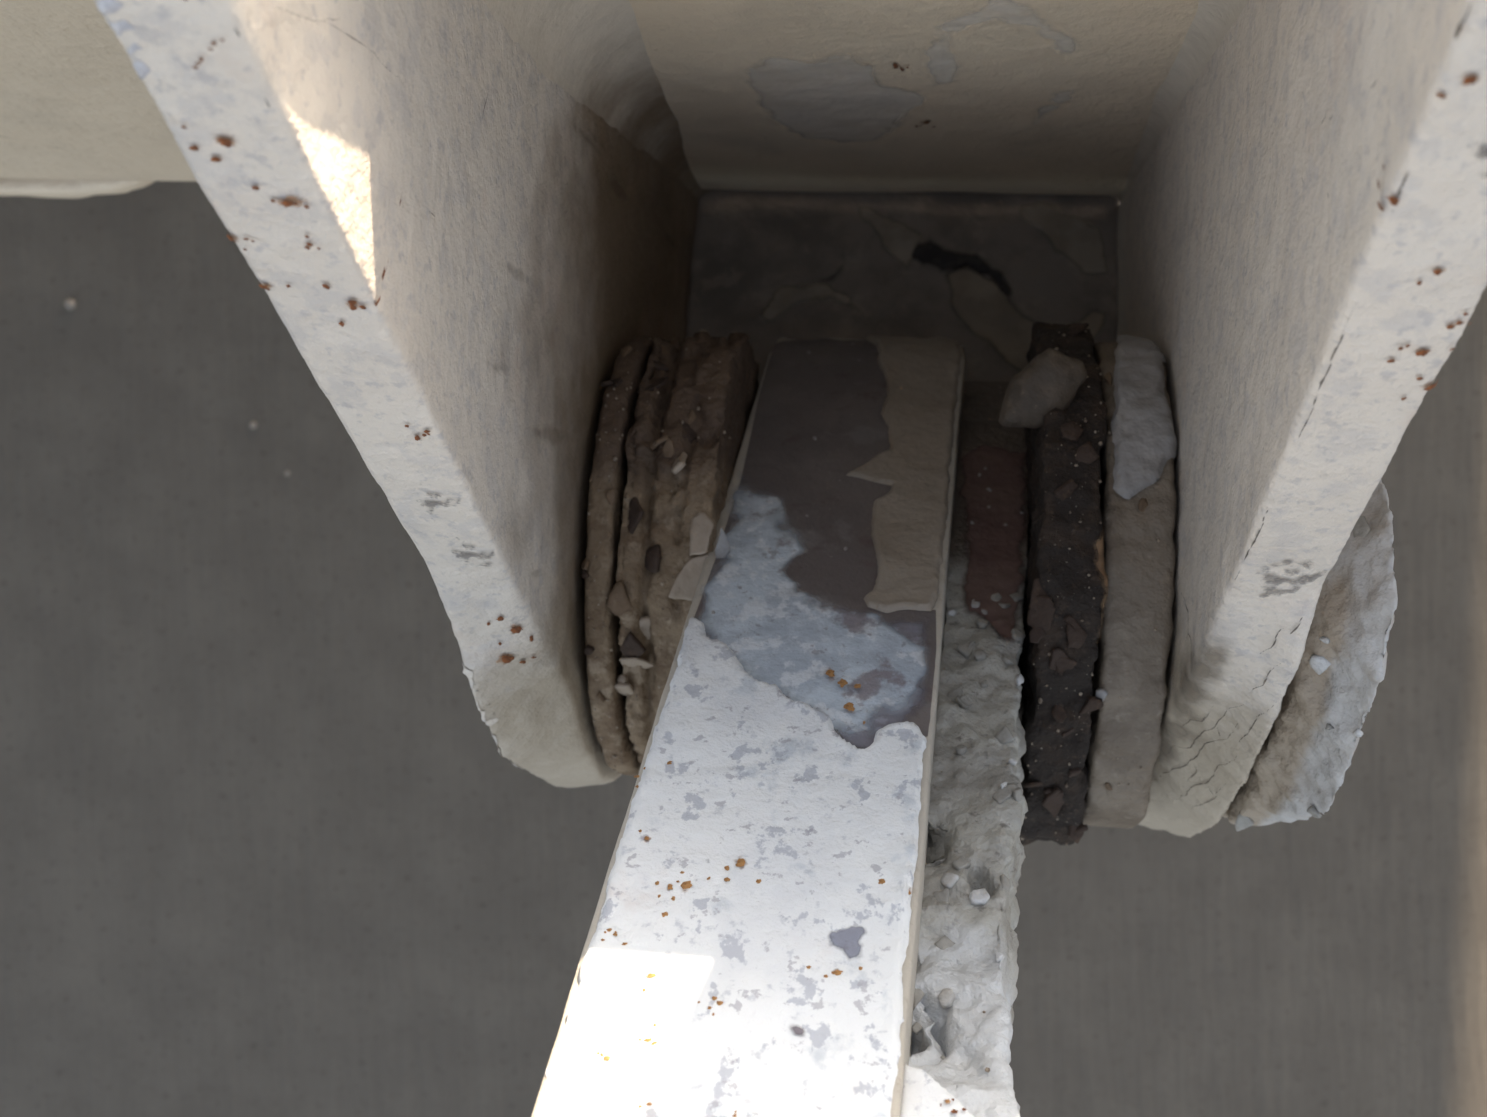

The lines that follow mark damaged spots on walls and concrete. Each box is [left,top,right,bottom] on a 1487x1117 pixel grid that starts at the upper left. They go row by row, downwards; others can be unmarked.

rust [189,137,233,162]
rust [251,186,310,209]
rust [1377,164,1399,211]
rust [338,259,389,327]
rust [1387,344,1430,363]
peeling [669,338,936,749]
rust [1095,534,1108,618]
rust [487,616,536,664]
crack [1157,618,1302,806]
rust [655,858,745,917]